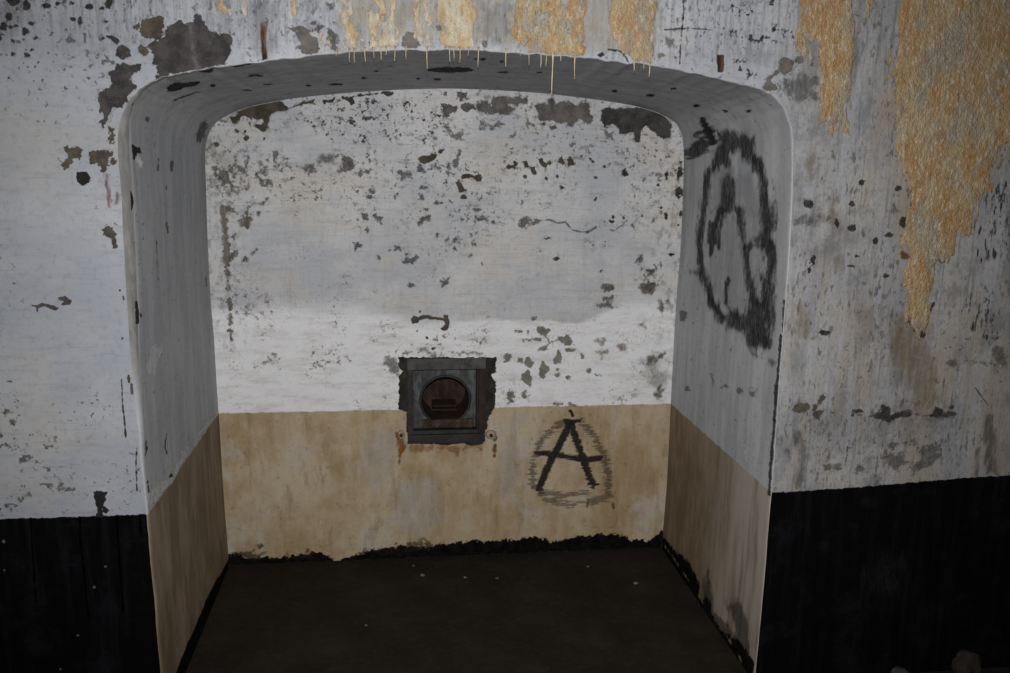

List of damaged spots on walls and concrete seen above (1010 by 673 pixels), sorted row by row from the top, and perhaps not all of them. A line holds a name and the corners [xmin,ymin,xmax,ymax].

corrosion [260,21,268,60]
peeling [58,13,272,172]
peeling [229,83,394,141]
peeling [441,91,674,143]
crack [534,219,627,234]
spalling [969,293,994,341]
corrosion [396,433,497,463]